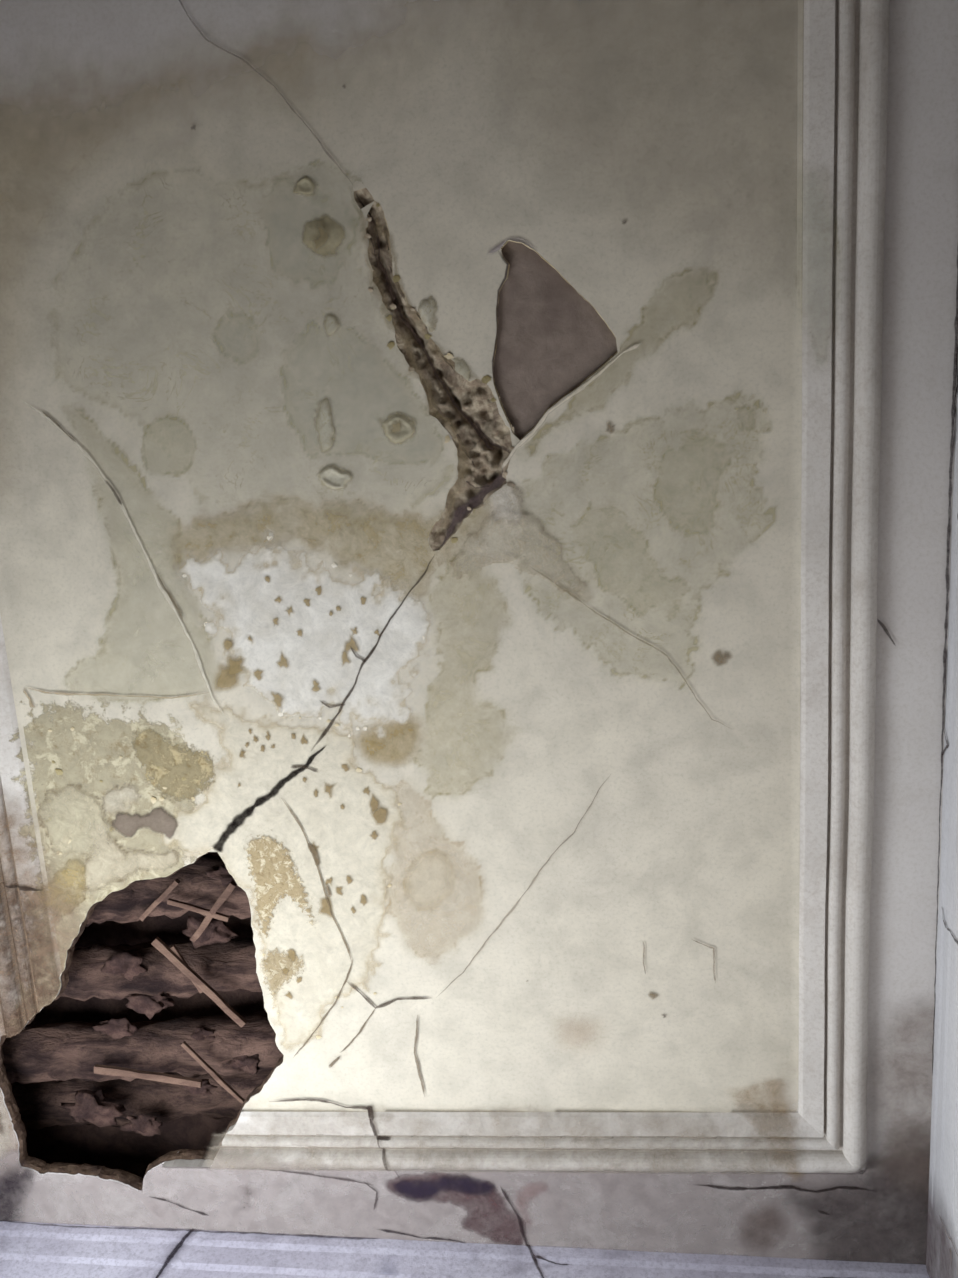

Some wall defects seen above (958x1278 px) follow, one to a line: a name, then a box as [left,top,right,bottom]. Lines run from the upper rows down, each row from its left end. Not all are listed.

crack [179,0,338,165]
flaking render [489,238,639,467]
crack [23,413,216,707]
damp [0,0,804,1150]
crack [213,188,599,1094]
crack [932,255,958,1072]
crack [0,882,40,891]
peeling [0,533,429,1190]
crack [0,1099,464,1278]
damp [0,1090,954,1278]